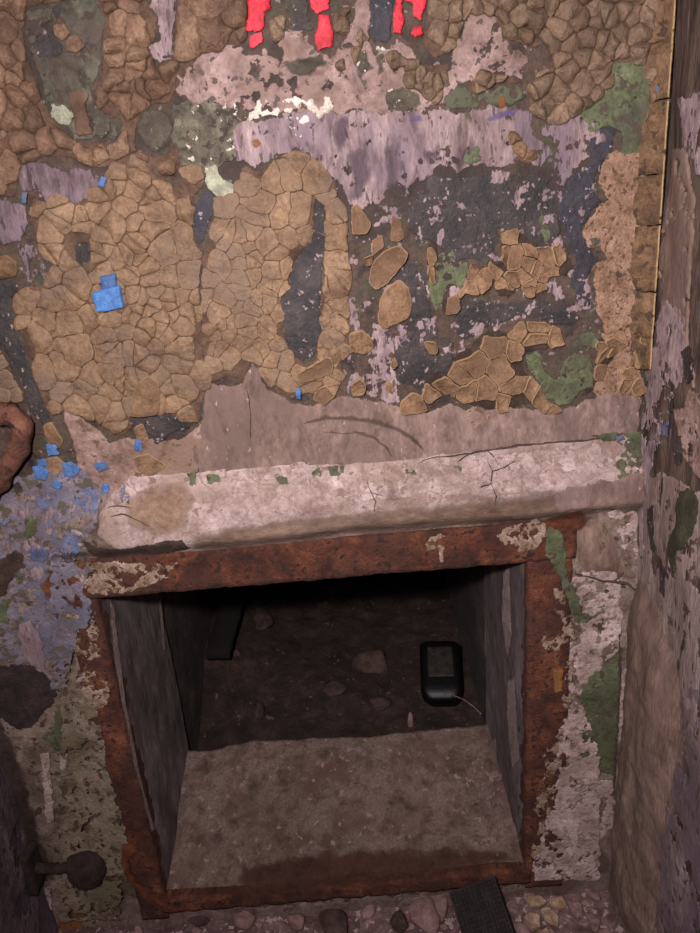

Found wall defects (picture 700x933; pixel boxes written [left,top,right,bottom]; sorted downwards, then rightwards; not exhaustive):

peeling [0,758,52,933]
peeling [40,556,426,929]
flaking render [0,0,700,730]
corrosion [199,848,507,895]
crack [418,438,598,502]
peeling [496,518,627,933]
corrosion [541,512,586,530]
peeling [630,471,700,933]